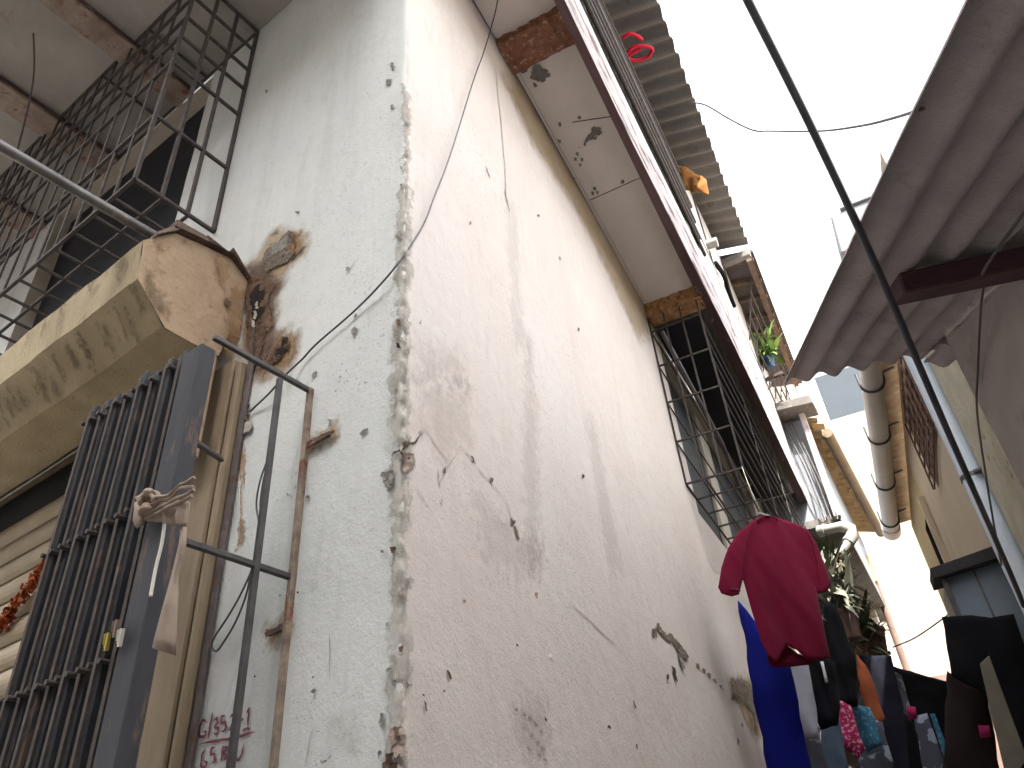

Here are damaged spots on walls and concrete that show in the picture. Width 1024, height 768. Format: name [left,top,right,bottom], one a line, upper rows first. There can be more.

peeling [574,126,602,166]
spalling [243,229,306,381]
peeling [377,62,425,768]
crack [417,428,520,539]
peeling [652,623,760,735]